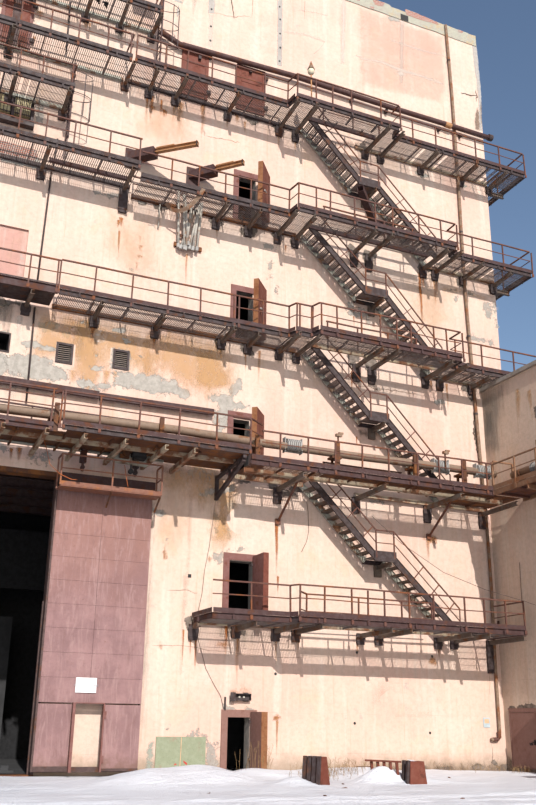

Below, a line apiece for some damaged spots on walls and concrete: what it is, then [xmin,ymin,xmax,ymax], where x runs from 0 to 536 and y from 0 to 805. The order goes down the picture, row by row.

peeling [38,322,70,336]
peeling [0,327,190,399]
peeling [188,467,249,539]
spalling [268,483,303,497]